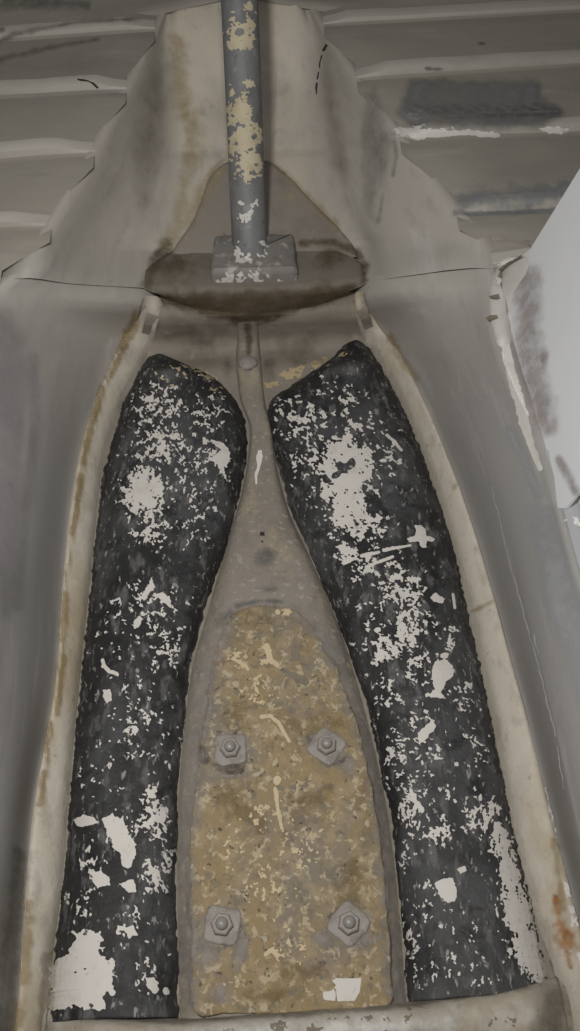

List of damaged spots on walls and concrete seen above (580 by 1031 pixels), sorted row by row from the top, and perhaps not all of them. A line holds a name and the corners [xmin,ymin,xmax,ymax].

peeling [222,1,257,51]
water stain [400,80,560,127]
peeling [226,79,264,185]
peeling [237,198,259,223]
peeling [216,240,281,283]